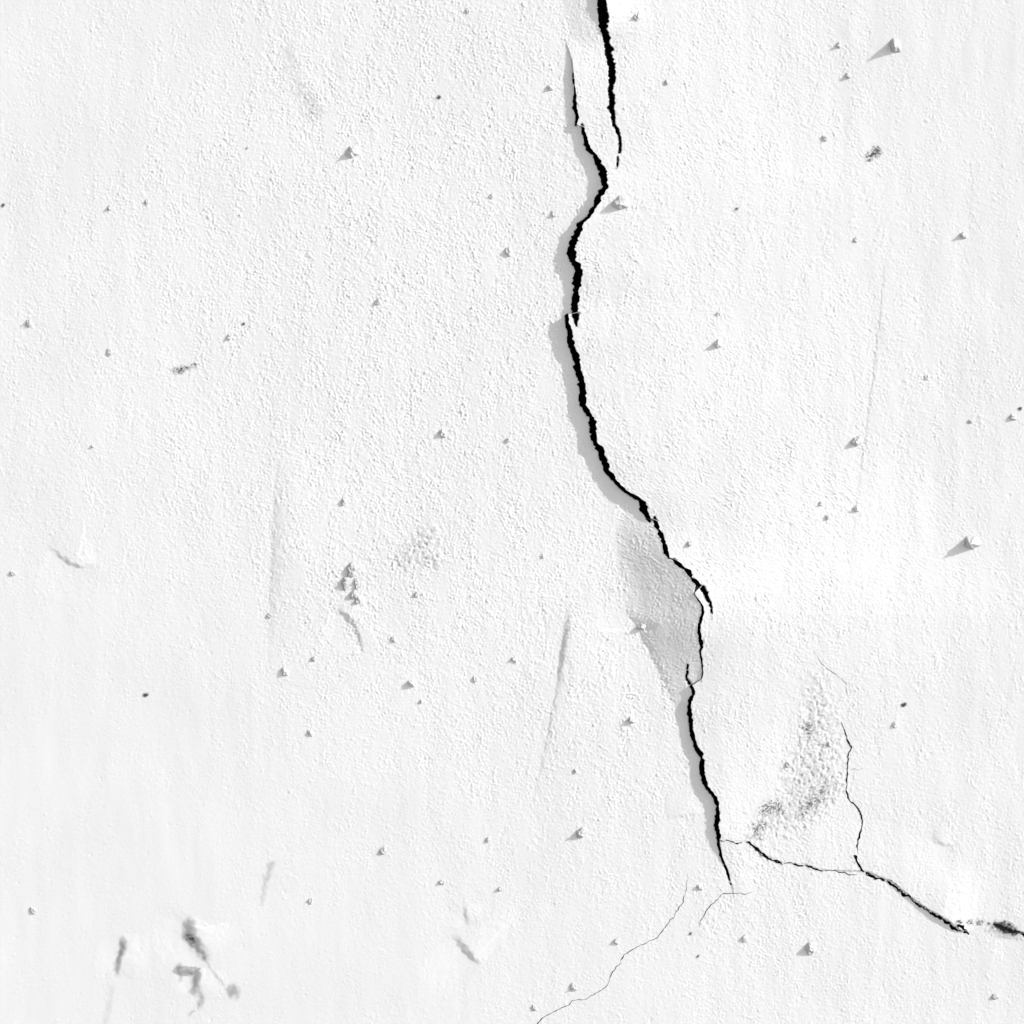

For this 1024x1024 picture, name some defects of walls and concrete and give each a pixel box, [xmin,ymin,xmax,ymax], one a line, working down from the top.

crack [537,0,969,1024]